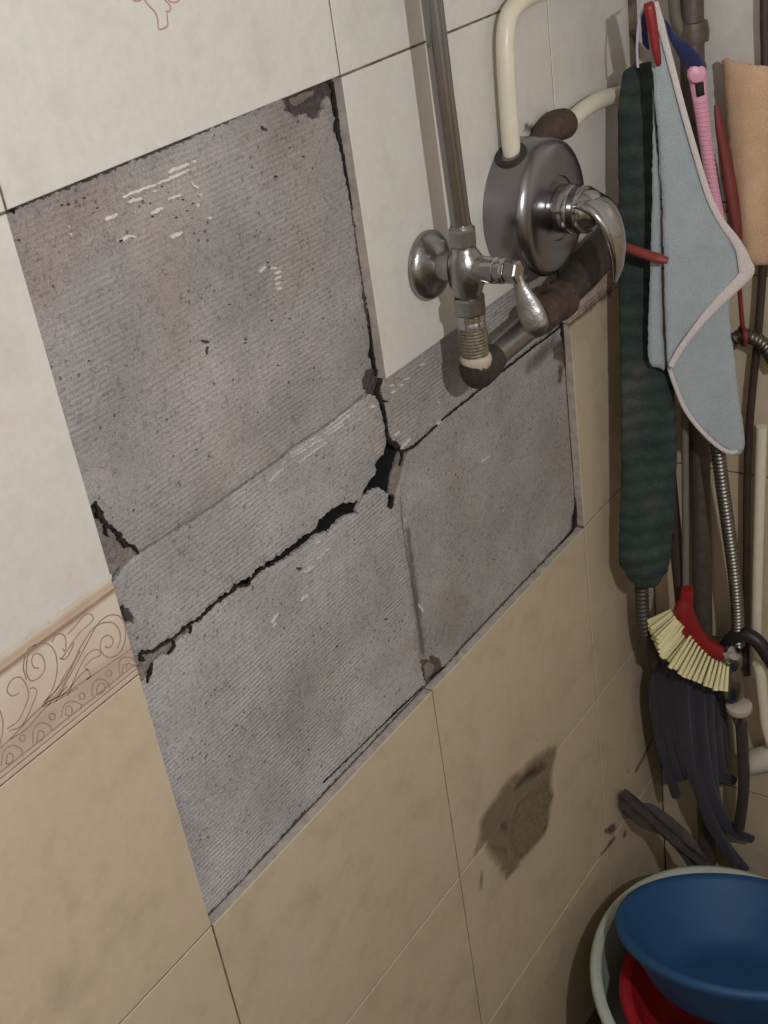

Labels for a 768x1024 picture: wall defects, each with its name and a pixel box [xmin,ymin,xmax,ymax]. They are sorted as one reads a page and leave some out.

crack [300,79,356,227]
spalling [4,81,574,913]
crack [93,296,565,783]
crack [521,497,578,587]
leakage [482,751,554,873]